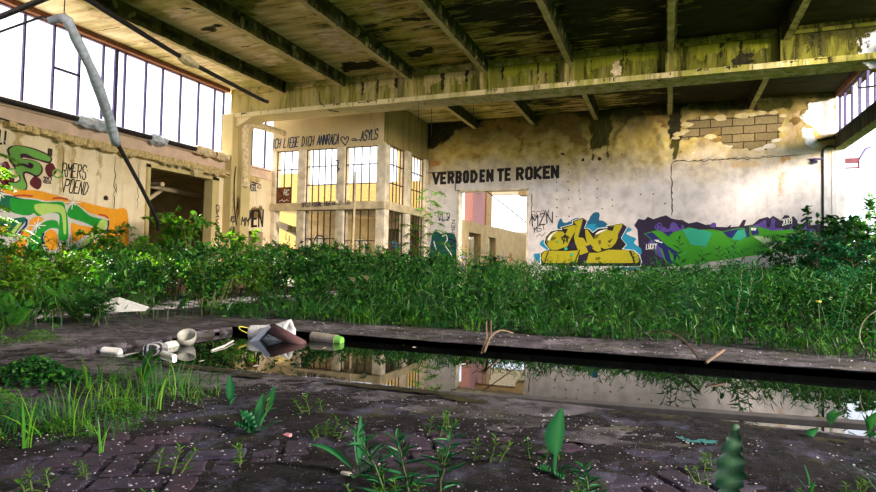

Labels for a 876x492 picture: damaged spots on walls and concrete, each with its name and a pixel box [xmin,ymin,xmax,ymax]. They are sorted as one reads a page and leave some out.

damp [201,24,288,66]
damp [313,27,384,73]
damp [358,74,403,103]
damp [424,67,473,95]
damp [603,49,649,82]
damp [677,0,782,72]
damp [847,23,864,53]
peeling [856,31,876,69]
damp [428,112,613,161]
flaking render [671,98,837,155]
crack [670,153,814,215]